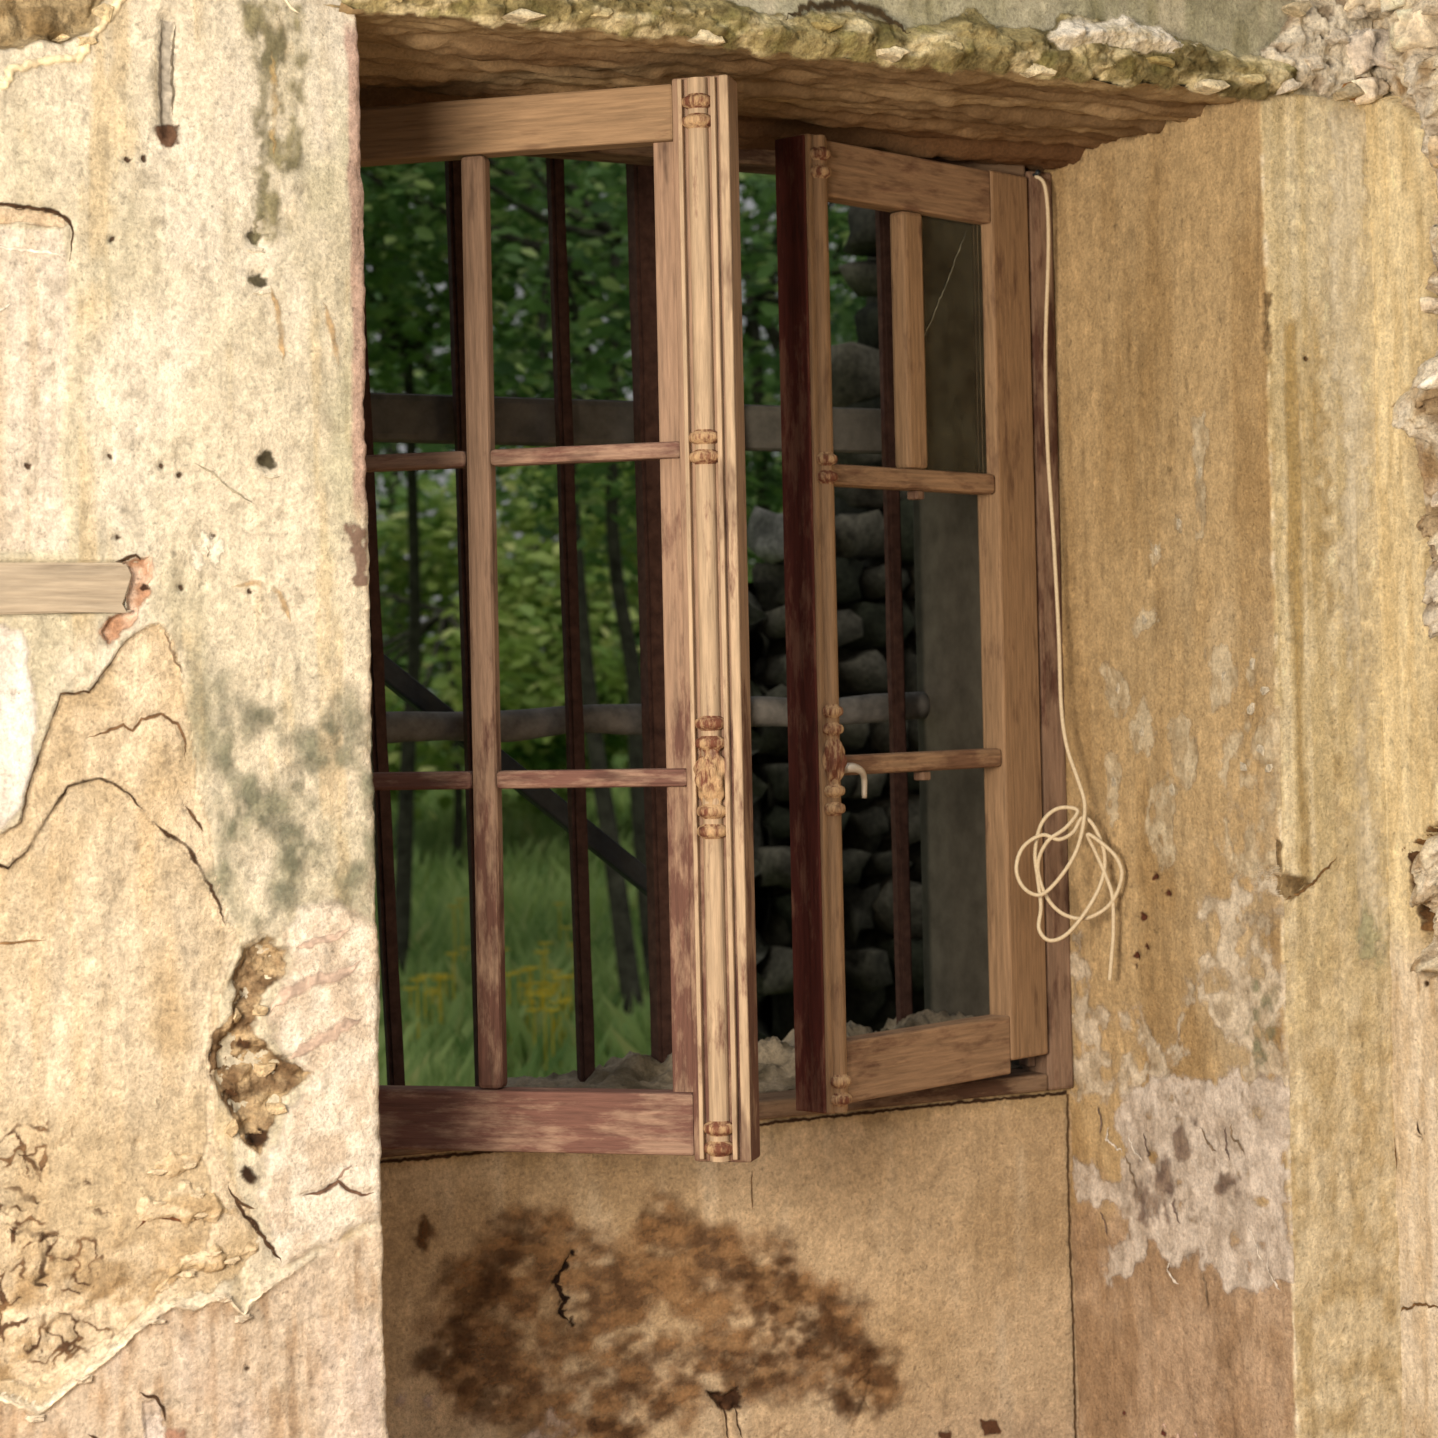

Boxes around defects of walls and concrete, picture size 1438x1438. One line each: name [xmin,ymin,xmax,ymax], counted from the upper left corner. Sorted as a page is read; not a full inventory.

damp [242,2,306,99]
damp [253,111,301,240]
flaking render [0,554,316,1423]
peeling [1070,640,1310,1307]
spalling [1404,826,1438,889]
spalling [1417,904,1435,931]
crack [0,1122,110,1365]
crack [303,1151,503,1196]
damp [415,1215,434,1250]
crack [552,1250,574,1326]
damp [418,1196,898,1438]
crack [760,1090,1077,1438]